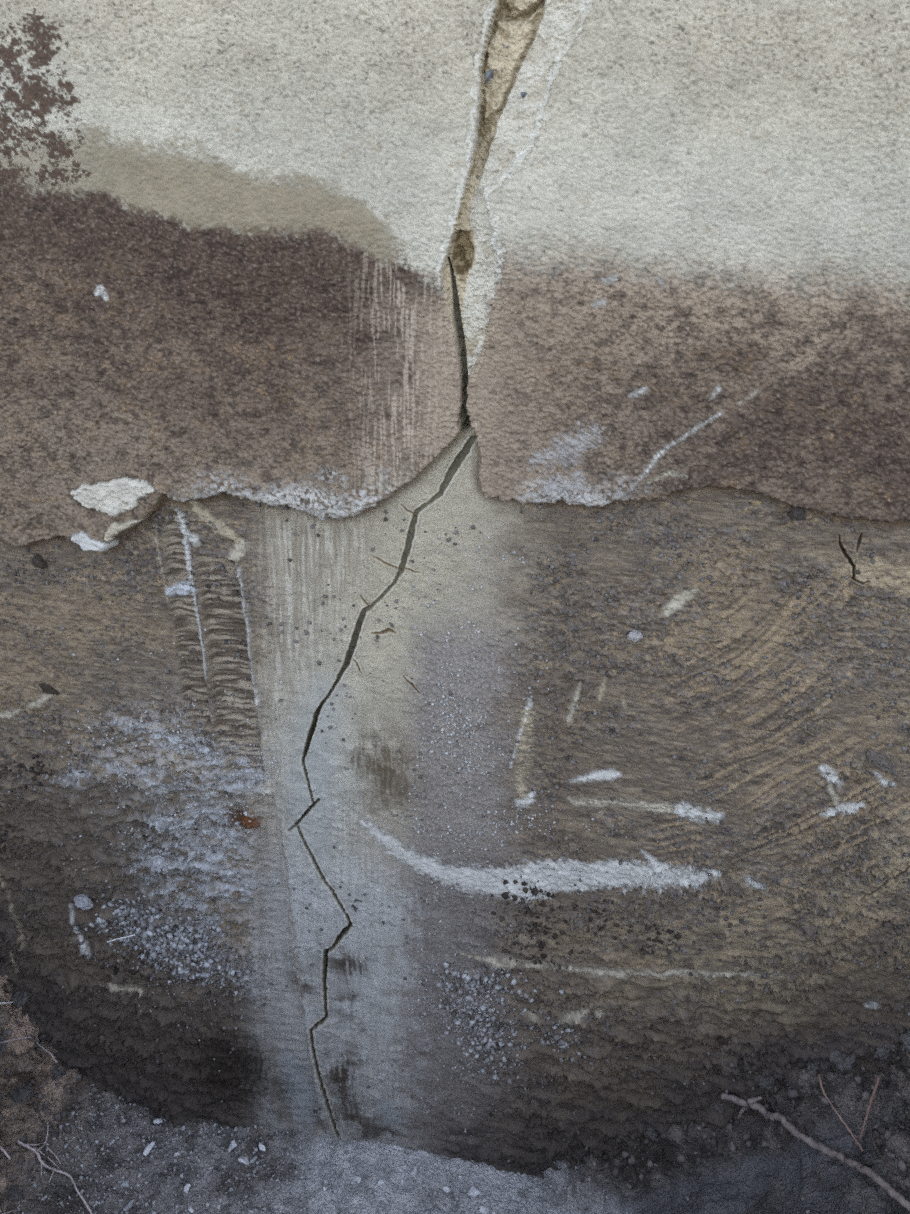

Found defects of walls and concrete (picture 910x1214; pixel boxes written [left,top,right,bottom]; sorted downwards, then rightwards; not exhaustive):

water stain [0,8,395,259]
peeling [70,477,154,552]
peeling [253,471,354,517]
water stain [530,427,604,493]
water stain [637,413,721,484]
crack [284,0,594,1140]